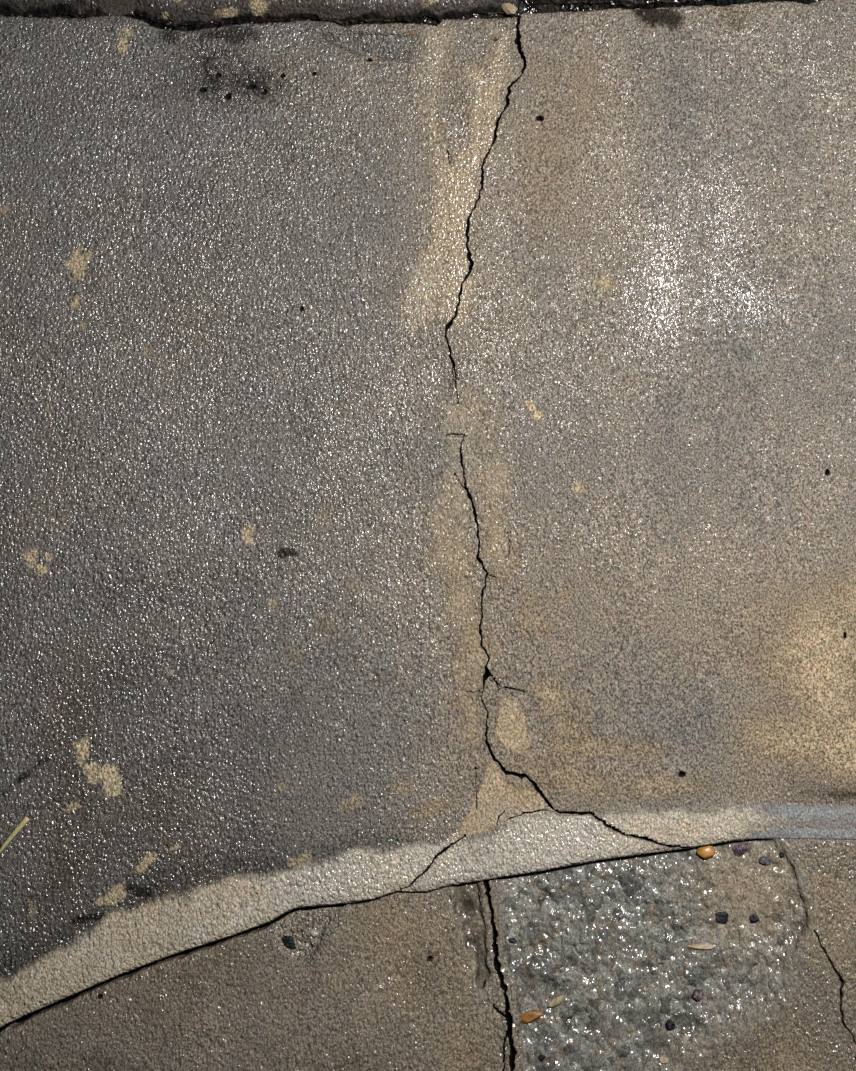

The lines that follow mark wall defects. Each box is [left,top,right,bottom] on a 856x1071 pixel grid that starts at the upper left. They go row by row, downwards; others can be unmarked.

crack [439,14,532,404]
crack [446,433,697,851]
crack [401,832,467,891]
crack [477,879,523,1071]
spalling [442,838,820,1071]
crack [810,927,856,1071]